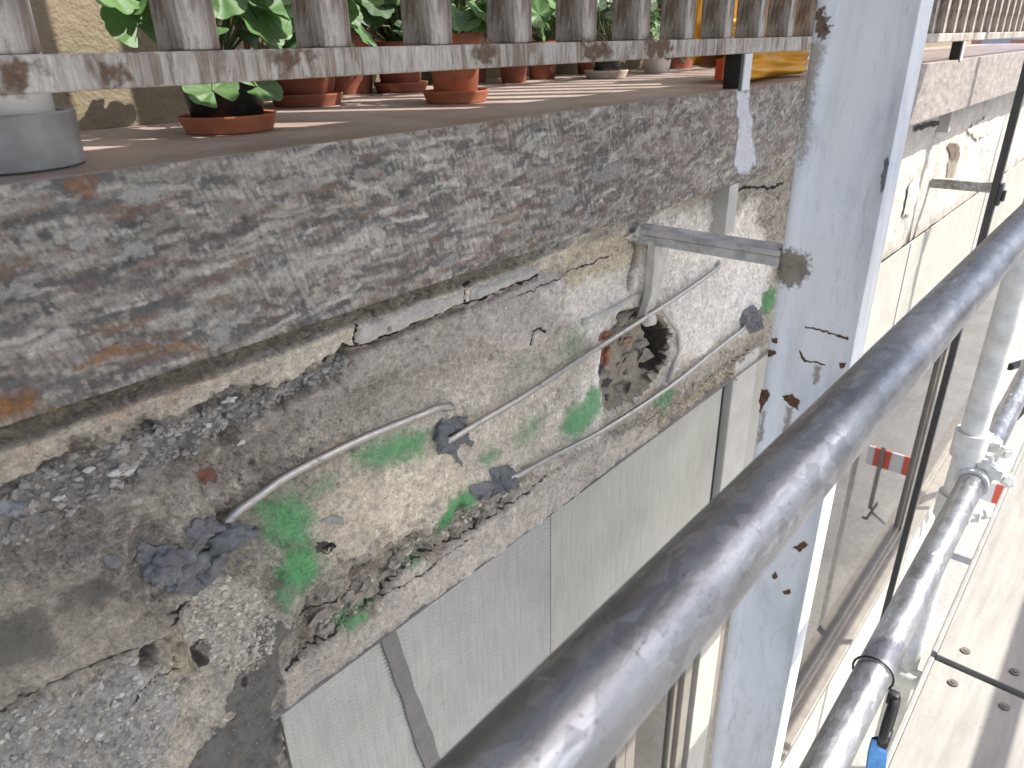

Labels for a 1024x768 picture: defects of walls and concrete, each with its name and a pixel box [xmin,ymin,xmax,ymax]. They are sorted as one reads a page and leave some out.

crack [738,181,784,192]
peeling [0,280,38,301]
peeling [111,240,154,262]
crack [322,254,612,363]
spalling [0,355,353,550]
spalling [216,402,456,525]
spalling [307,260,754,639]
crack [285,476,546,671]
spalling [182,575,278,691]